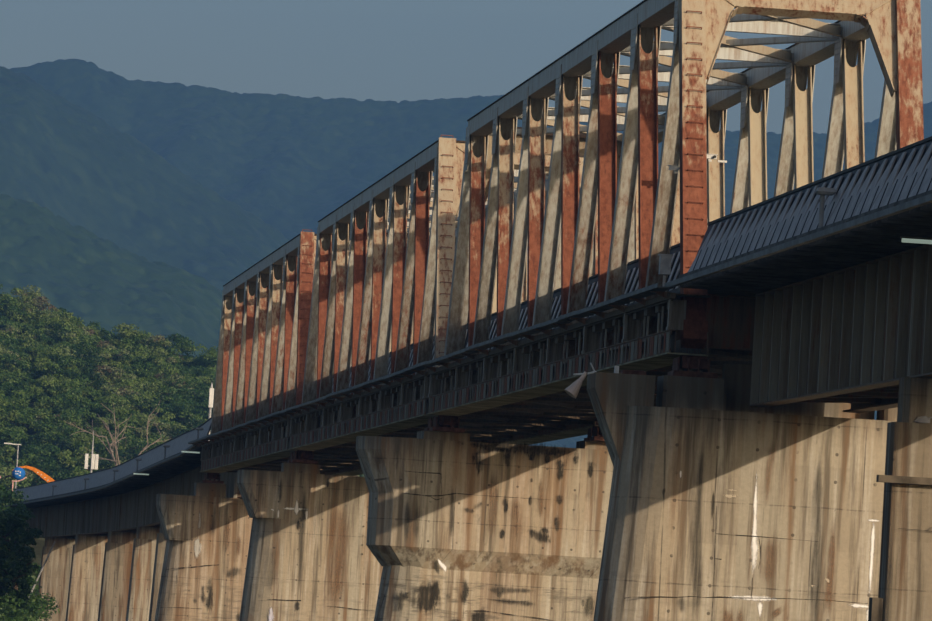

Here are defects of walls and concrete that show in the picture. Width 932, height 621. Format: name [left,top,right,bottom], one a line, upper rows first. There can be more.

damp [472,441,577,480]
damp [530,518,559,542]
damp [693,455,703,602]
damp [811,472,821,616]
damp [869,519,879,590]
damp [398,581,440,613]
damp [473,610,485,621]
damp [492,587,532,605]
damp [732,596,771,615]